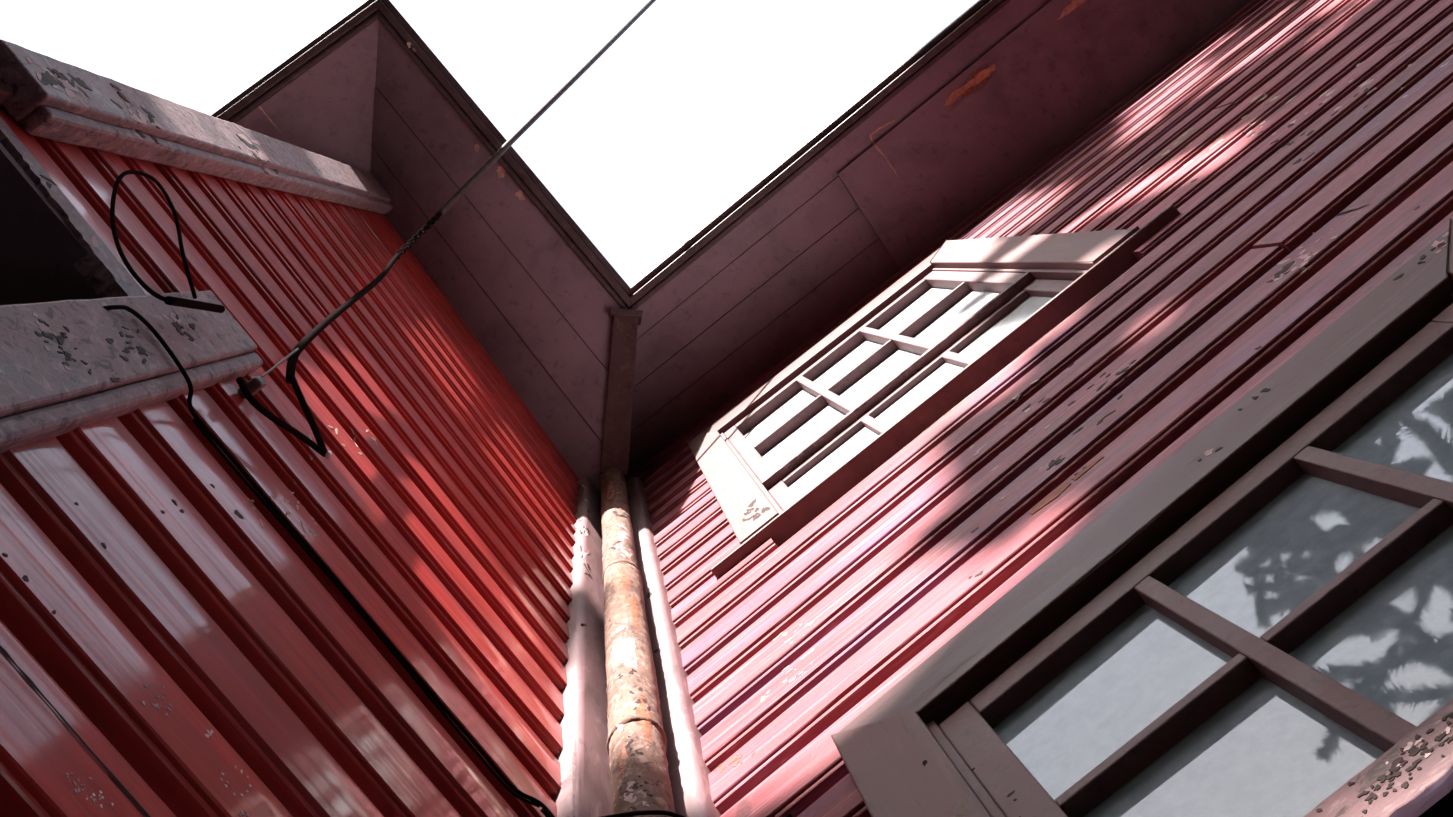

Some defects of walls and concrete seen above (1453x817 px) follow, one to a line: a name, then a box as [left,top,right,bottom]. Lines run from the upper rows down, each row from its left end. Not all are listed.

peeling [26,56,93,108]
peeling [110,83,163,144]
peeling [232,122,280,177]
peeling [32,312,92,374]
peeling [105,326,148,383]
peeling [162,312,195,341]
peeling [579,485,592,578]
peeling [609,511,632,557]
peeling [611,638,650,757]
peeling [618,776,654,810]
peeling [1347,712,1453,817]